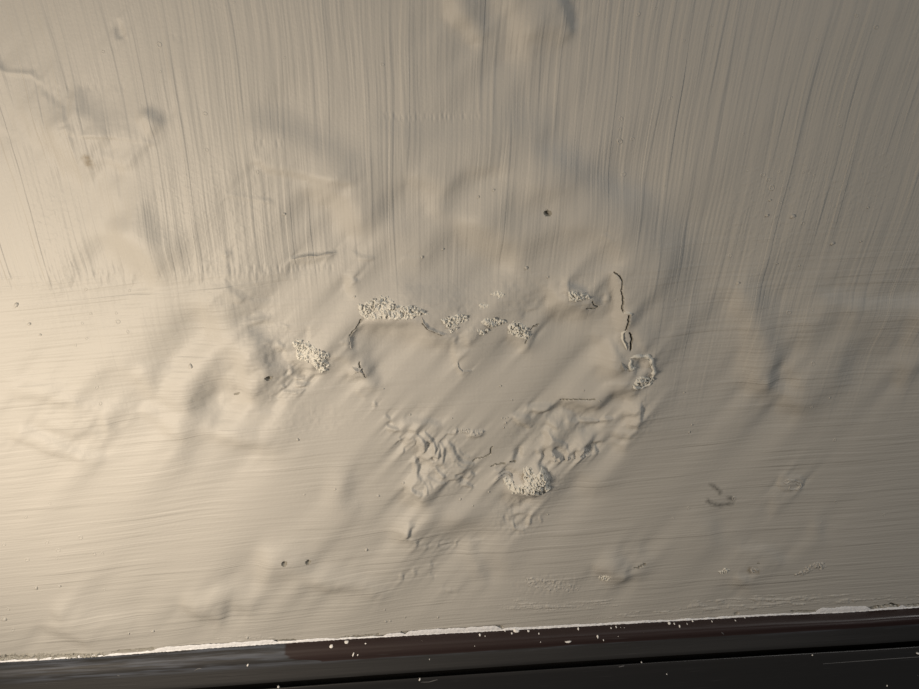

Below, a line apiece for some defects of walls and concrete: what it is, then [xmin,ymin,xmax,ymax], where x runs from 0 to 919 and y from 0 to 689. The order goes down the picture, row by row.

peeling [358,296,468,336]
peeling [477,291,531,340]
crack [613,271,633,352]
peeling [292,339,330,373]
spalling [621,330,656,390]
peeling [495,466,551,496]